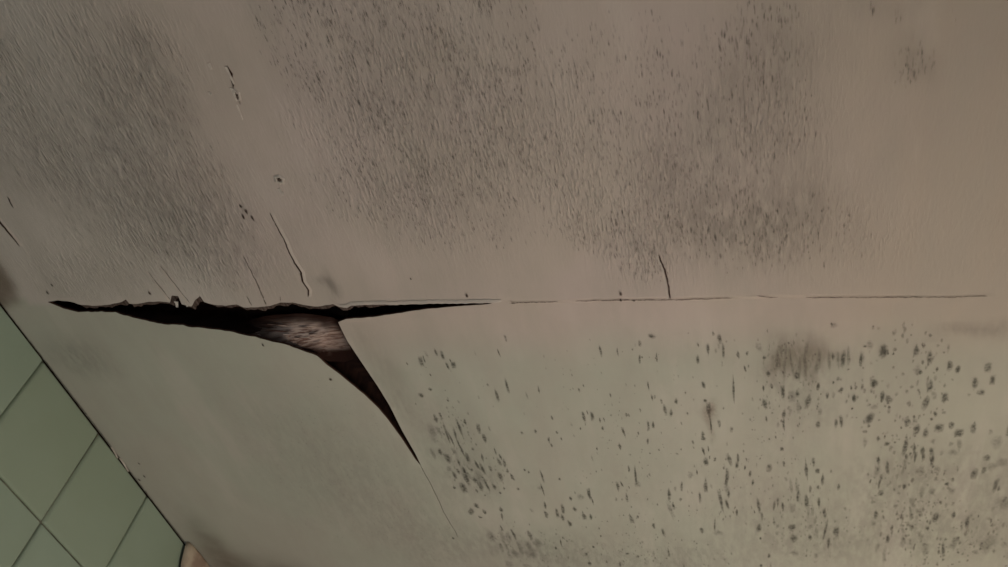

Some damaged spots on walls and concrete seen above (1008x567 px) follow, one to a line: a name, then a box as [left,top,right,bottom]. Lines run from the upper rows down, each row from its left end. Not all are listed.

crack [0,196,23,246]
crack [592,254,725,301]
crack [808,293,976,301]
crack [51,212,555,535]
crack [0,303,183,540]